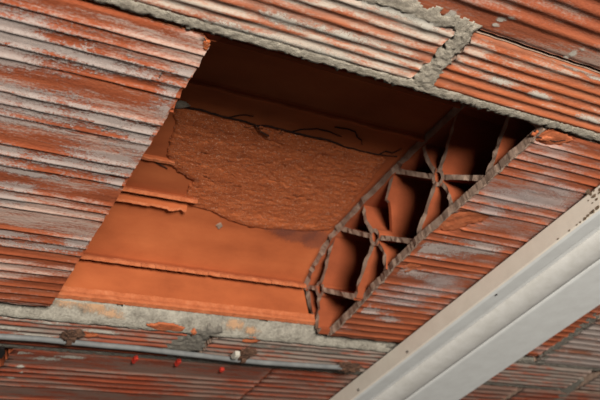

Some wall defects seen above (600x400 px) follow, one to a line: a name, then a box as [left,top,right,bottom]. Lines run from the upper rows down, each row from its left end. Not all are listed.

spalling [166,100,386,231]
crack [186,107,401,157]
peeling [439,211,490,231]
spalling [0,286,400,353]